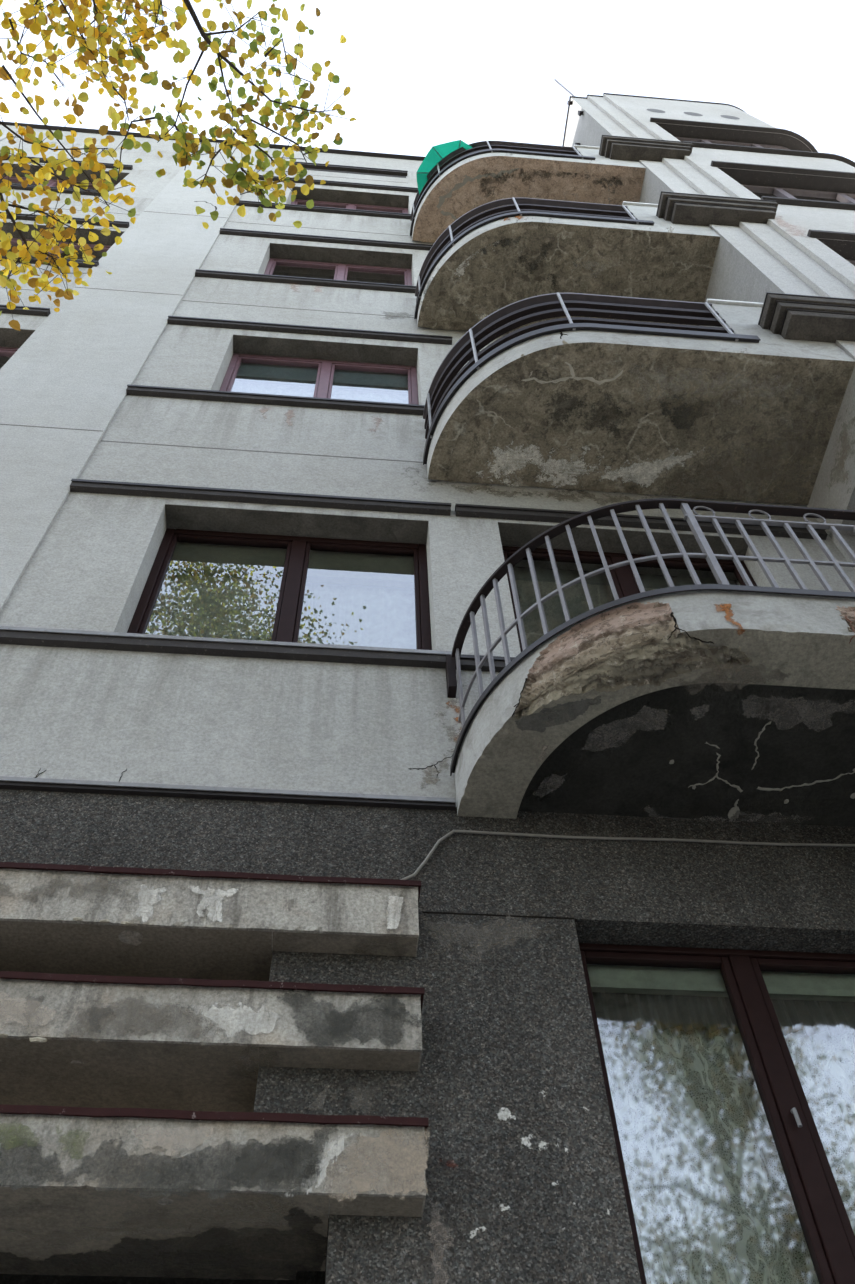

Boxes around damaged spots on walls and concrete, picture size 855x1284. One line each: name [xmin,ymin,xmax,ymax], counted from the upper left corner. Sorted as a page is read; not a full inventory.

leakage [480,169,577,196]
leakage [465,440,705,505]
corrosion [714,604,745,635]
spalling [512,601,855,732]
peeling [581,705,670,752]
crack [408,755,453,778]
crack [688,721,855,806]
leakage [0,877,166,922]
leakage [191,885,239,922]
leakage [63,998,278,1044]
leakage [325,1005,409,1046]
leakage [0,1129,430,1281]